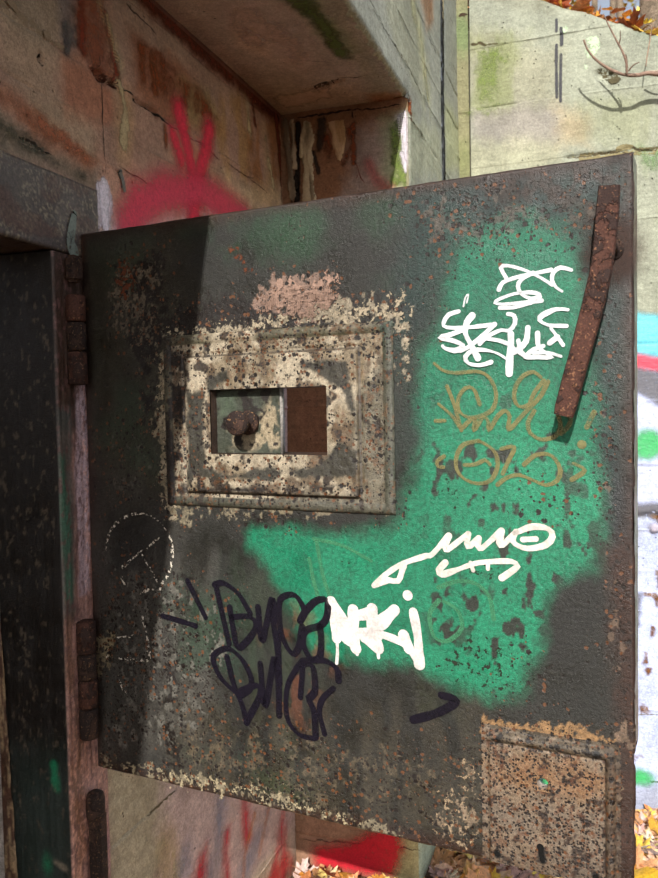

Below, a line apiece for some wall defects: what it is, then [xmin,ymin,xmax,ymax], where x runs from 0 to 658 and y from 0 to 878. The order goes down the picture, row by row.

crack [93,63,147,184]
crack [123,89,267,193]
crack [567,146,657,158]
corrosion [611,222,643,282]
peeling [166,269,414,336]
peeling [154,355,166,448]
peeling [154,460,177,521]